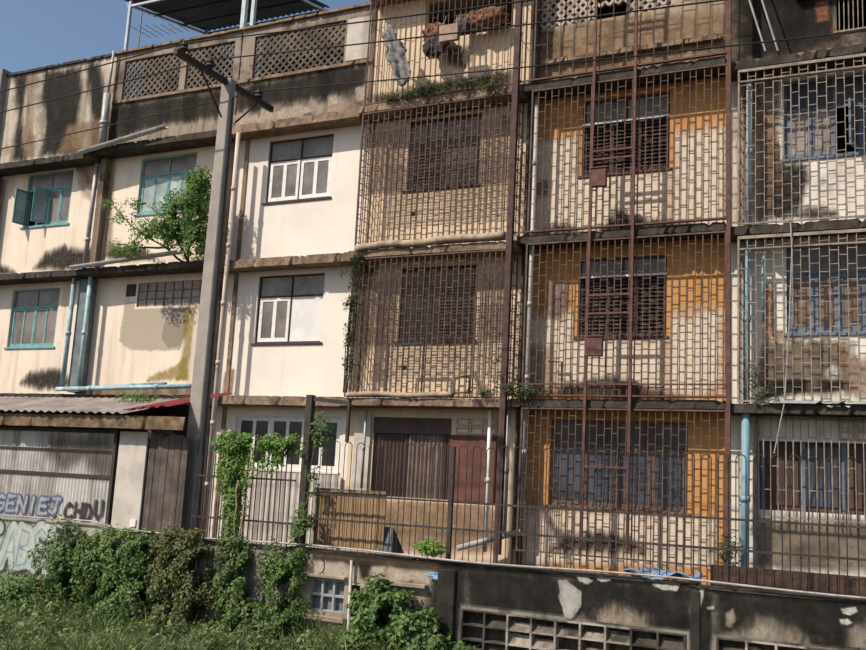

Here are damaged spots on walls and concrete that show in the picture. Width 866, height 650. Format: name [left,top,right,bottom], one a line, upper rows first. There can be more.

damp [13,64,220,161]
damp [742,79,835,219]
damp [37,245,91,270]
damp [20,369,69,390]
flaking render [559,577,608,619]
flaking render [840,608,857,625]